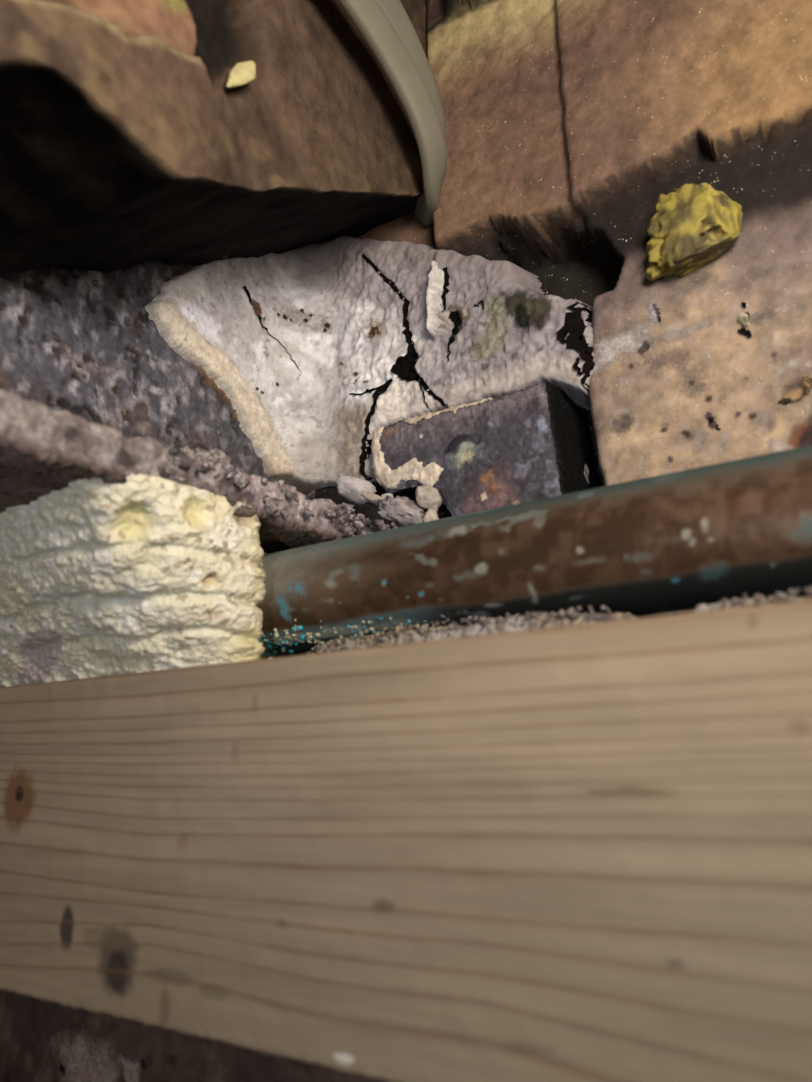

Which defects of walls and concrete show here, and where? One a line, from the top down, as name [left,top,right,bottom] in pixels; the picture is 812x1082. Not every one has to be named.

crack [243,286,301,371]
crack [349,253,448,484]
crack [556,301,595,392]